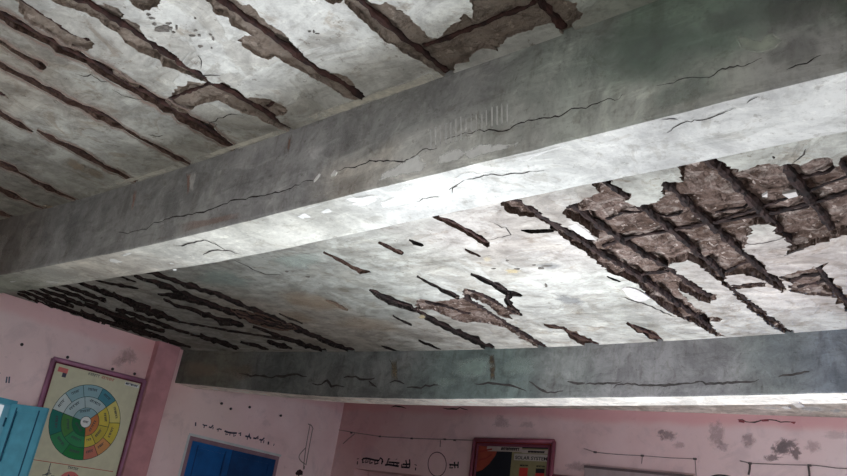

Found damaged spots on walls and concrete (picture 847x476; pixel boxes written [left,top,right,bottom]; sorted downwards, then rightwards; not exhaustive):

spalling [0,0,290,166]
spalling [206,0,366,100]
spalling [325,0,583,76]
crack [339,95,622,171]
crack [662,97,757,133]
crack [120,178,319,234]
crack [418,171,539,202]
spalling [500,155,847,337]
spalling [17,269,355,352]
spalling [369,273,547,349]
crack [477,371,809,393]
leakage [764,439,801,461]